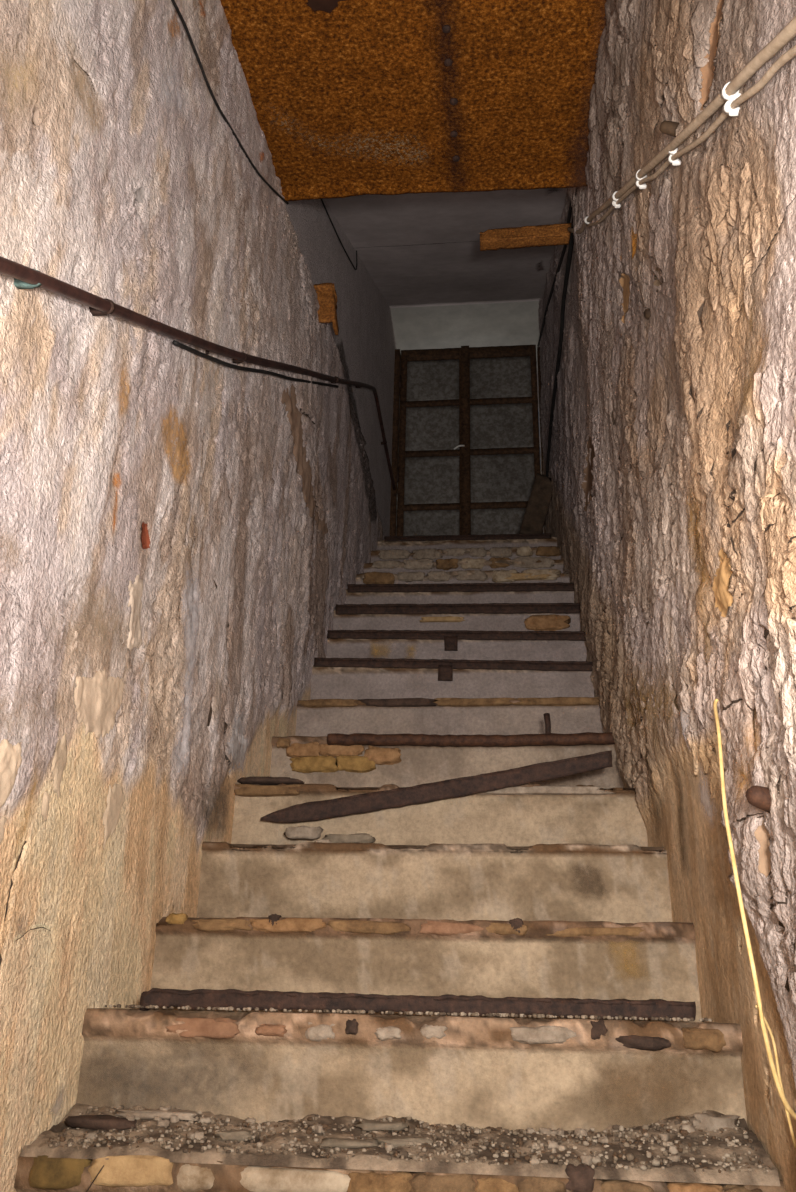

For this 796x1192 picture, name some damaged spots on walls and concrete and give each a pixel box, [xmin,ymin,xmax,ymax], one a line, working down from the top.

flaking render [0,739,22,844]
crack [0,838,51,966]